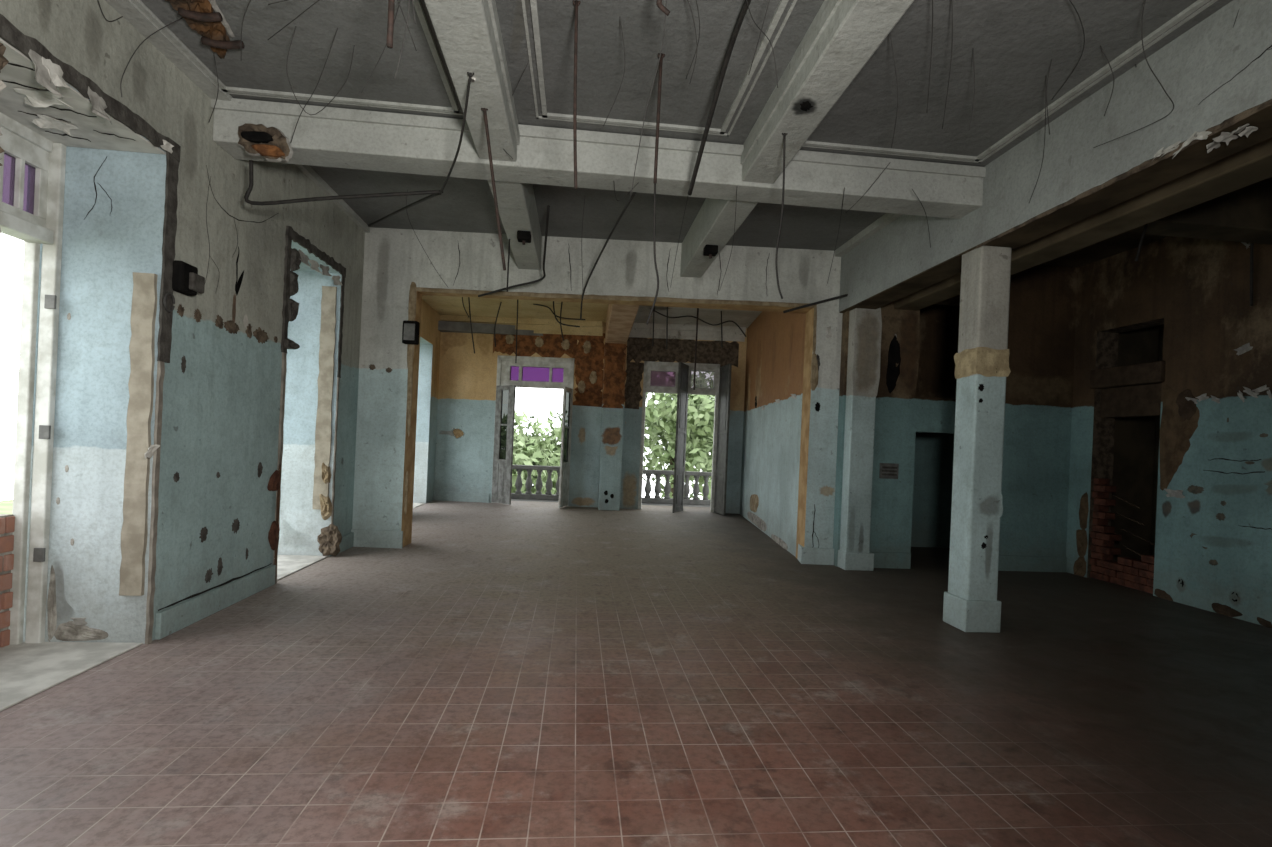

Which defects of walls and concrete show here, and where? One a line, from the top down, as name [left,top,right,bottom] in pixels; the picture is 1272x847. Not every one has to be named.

spalling [165,0,244,59]
peeling [0,42,136,142]
spalling [237,123,293,162]
spalling [976,99,1272,248]
spalling [408,282,820,423]
peeling [1237,385,1272,402]
spalling [1159,384,1227,522]
spalling [604,468,639,509]
spalling [205,557,223,583]